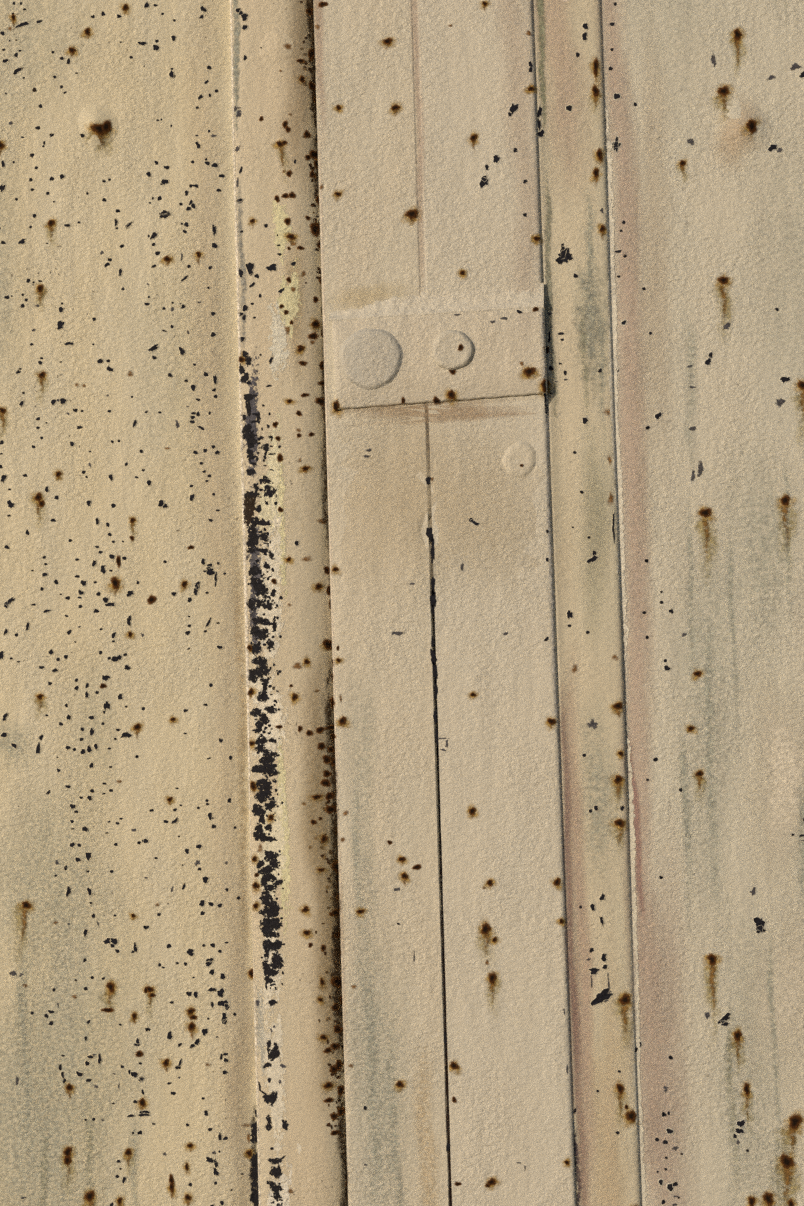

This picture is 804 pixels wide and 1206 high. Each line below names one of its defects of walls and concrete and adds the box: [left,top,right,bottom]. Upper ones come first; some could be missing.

corrosion [731,28,744,66]
corrosion [86,120,111,147]
corrosion [745,119,759,135]
peeling [145,161,198,268]
peeling [31,500,139,685]
peeling [45,614,133,938]
corrosion [298,639,356,1206]
peeling [158,942,236,1095]
corrosion [705,954,721,1008]
peeling [258,1025,288,1131]
peeling [266,1147,286,1206]
corrosion [747,1114,803,1206]